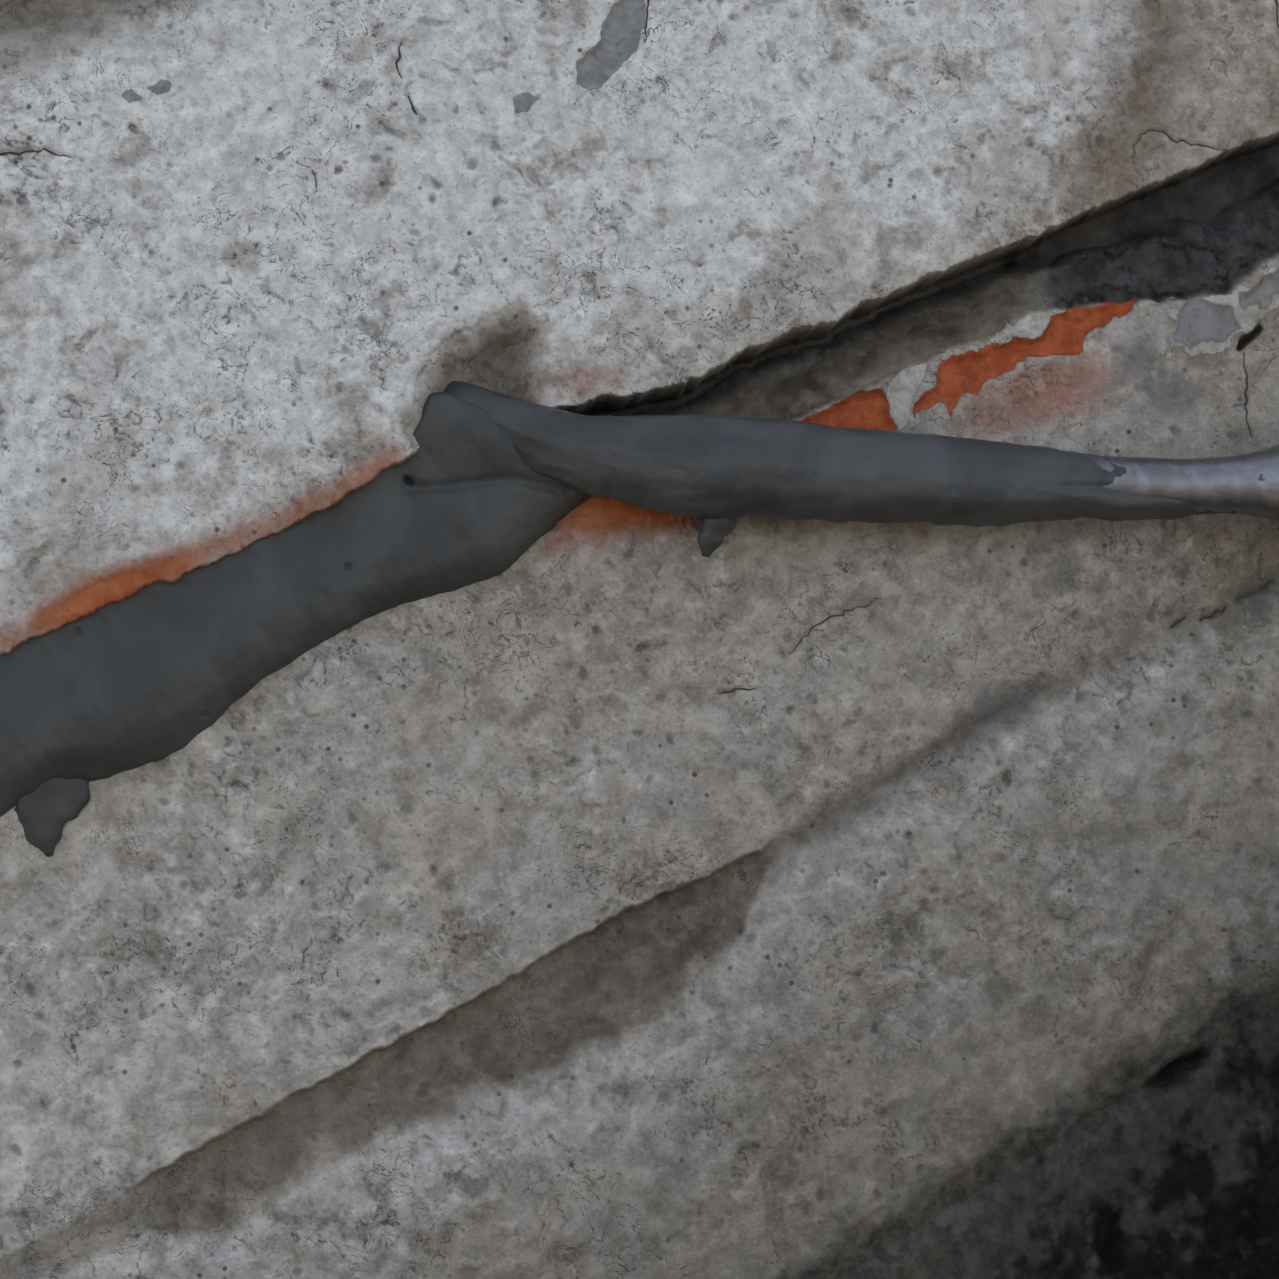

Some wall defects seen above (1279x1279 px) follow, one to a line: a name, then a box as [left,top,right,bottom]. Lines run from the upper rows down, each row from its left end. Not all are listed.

peeling [576,0,646,89]
peeling [513,92,538,113]
crack [1132,129,1219,158]
spalling [1164,266,1279,360]
spalling [801,298,1136,431]
crack [1244,355,1252,437]
water stain [995,1005,1279,1279]